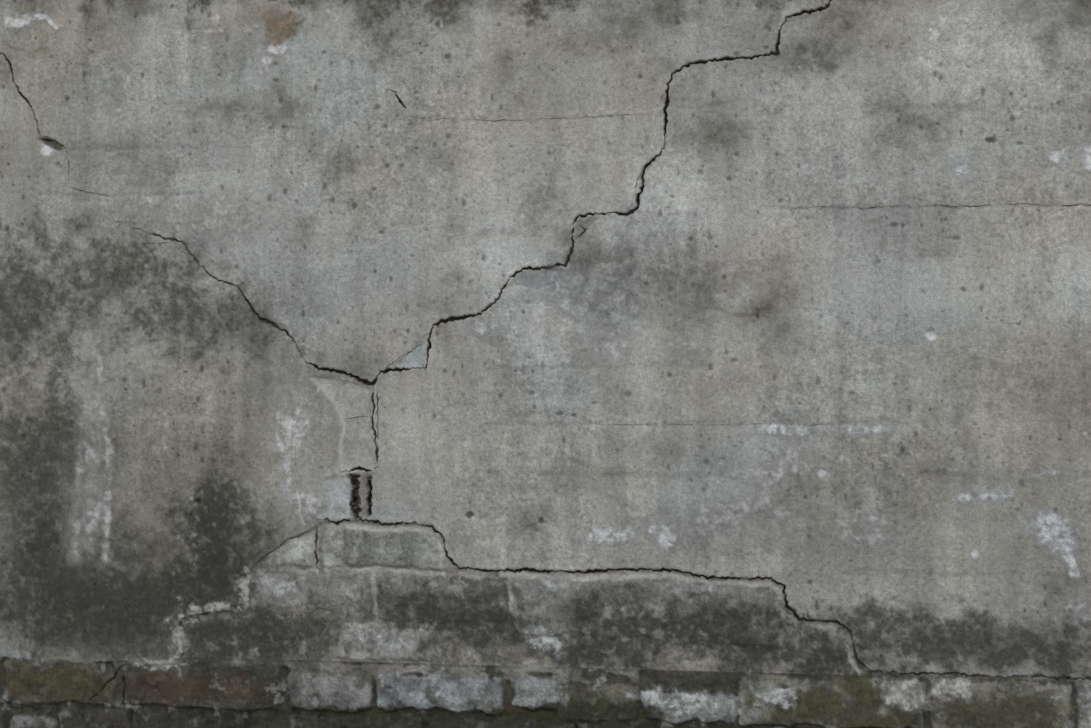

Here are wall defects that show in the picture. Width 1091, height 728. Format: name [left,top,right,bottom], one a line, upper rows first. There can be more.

damp [3,14,59,30]
damp [524,0,556,25]
crack [0,49,107,196]
crack [934,201,1091,209]
crack [111,0,990,682]
damp [0,187,297,676]
damp [273,389,323,527]
spalling [180,374,869,681]
damp [627,687,741,717]
damp [355,578,1091,711]
crack [1028,670,1091,686]